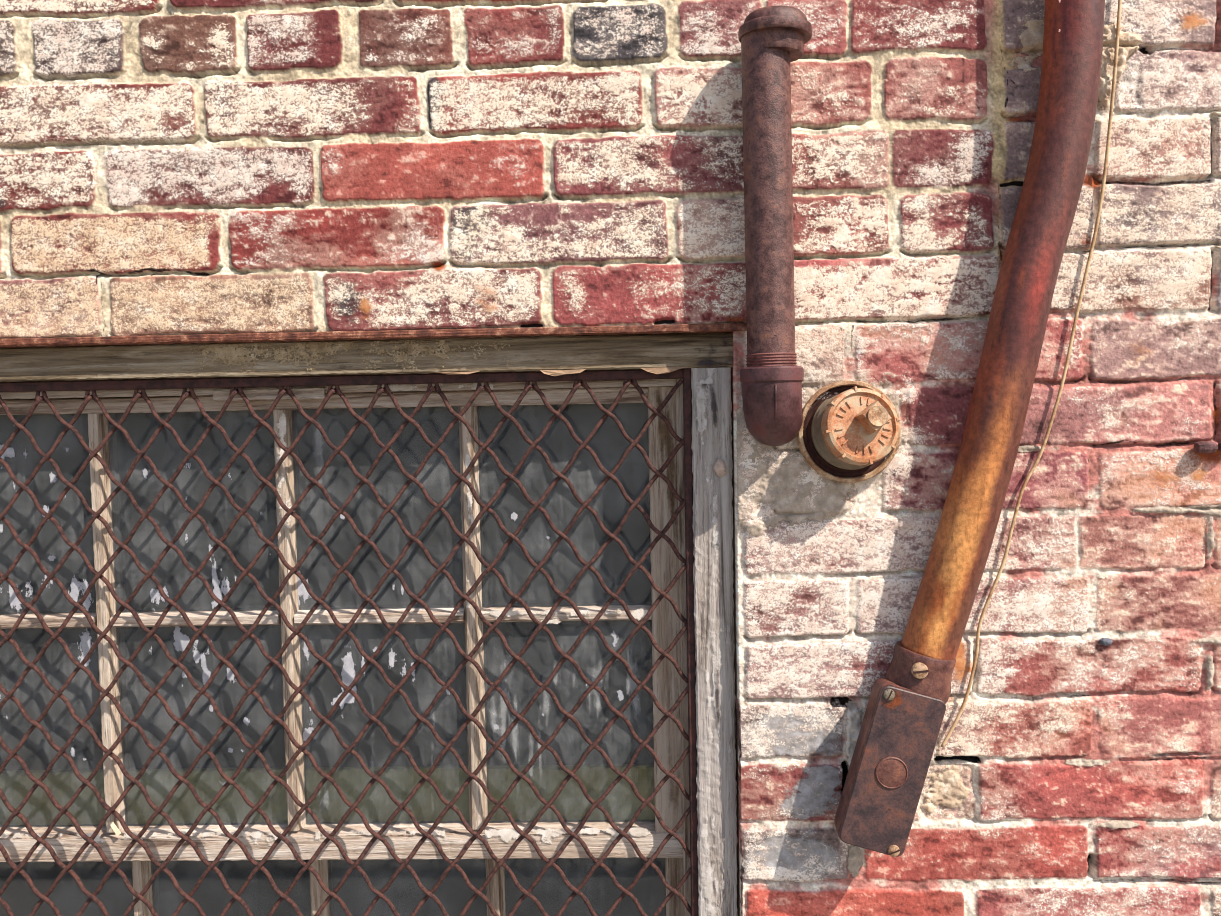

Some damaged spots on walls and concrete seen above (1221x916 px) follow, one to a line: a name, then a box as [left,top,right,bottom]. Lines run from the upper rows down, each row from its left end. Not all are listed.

crack [87,267,210,331]